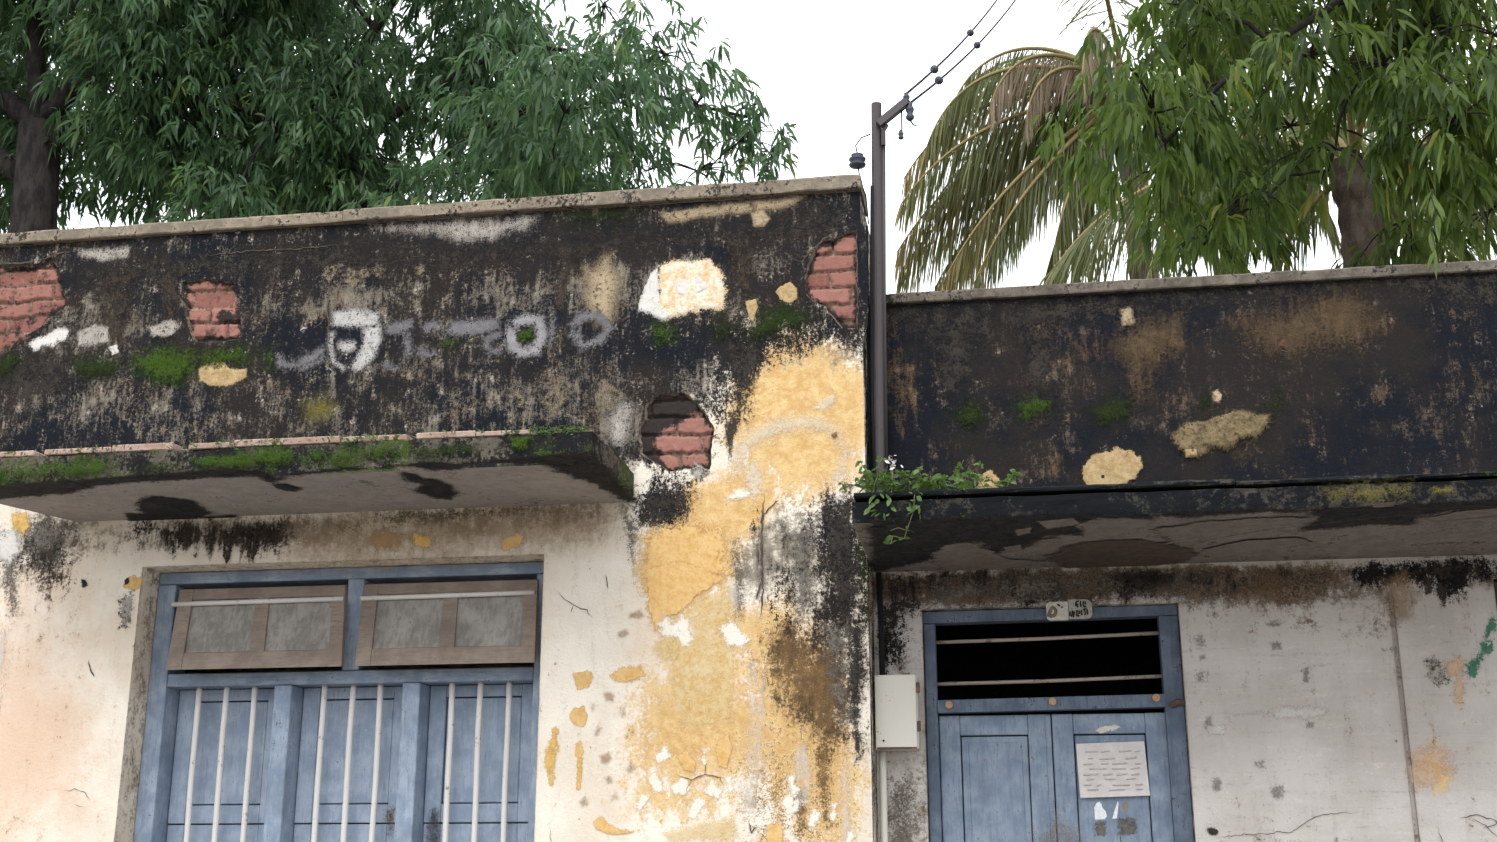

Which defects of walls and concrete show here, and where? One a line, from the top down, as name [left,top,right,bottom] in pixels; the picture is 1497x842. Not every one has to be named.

spalling [0,244,131,364]
spalling [147,273,248,387]
peeling [368,211,544,249]
flaking render [580,246,758,336]
spalling [776,224,869,337]
spalling [542,386,855,503]
flaking render [1082,446,1143,485]
leakage [0,451,597,699]
leakage [728,538,745,622]
leakage [1370,555,1497,618]
leakage [739,482,1223,842]
peeling [544,663,739,842]